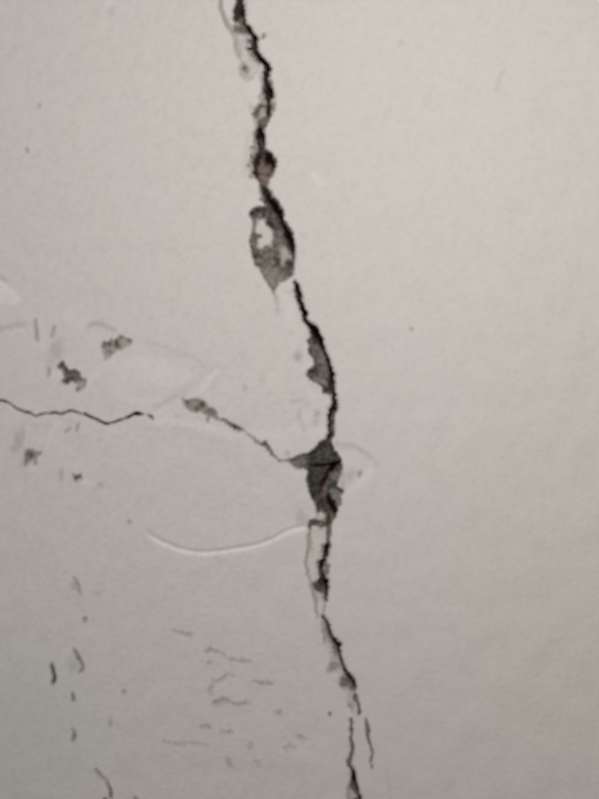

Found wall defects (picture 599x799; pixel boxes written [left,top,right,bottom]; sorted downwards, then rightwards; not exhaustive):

crack [218,0,274,109]
crack [257,134,296,254]
peeling [56,360,87,392]
crack [0,399,154,425]
peeling [101,334,133,361]
crack [181,397,292,463]
crack [298,285,338,438]
crack [304,460,340,619]
crack [162,628,273,747]
crack [345,692,374,779]